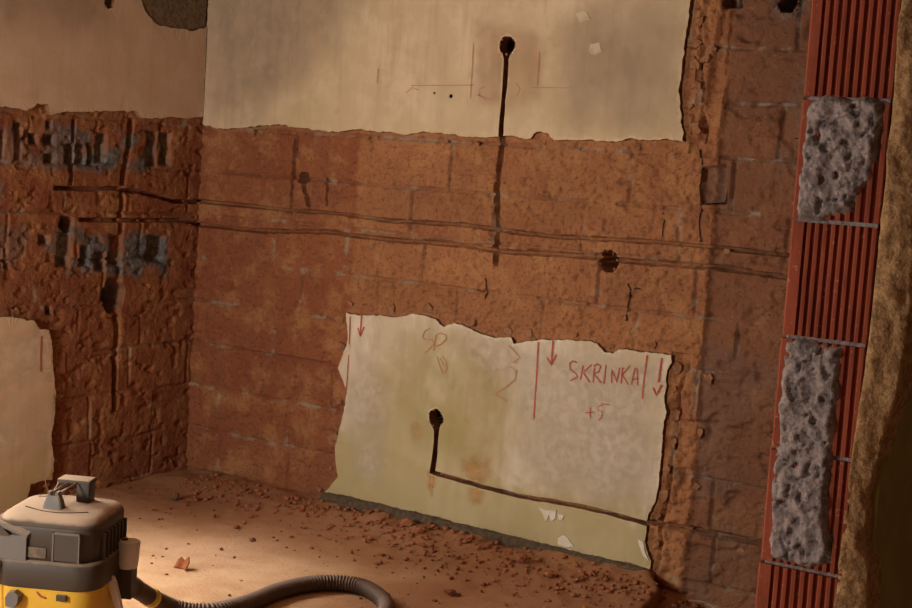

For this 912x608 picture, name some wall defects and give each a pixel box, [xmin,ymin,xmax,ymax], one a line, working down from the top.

flaking render [0,0,812,540]
peeling [555,535,574,547]